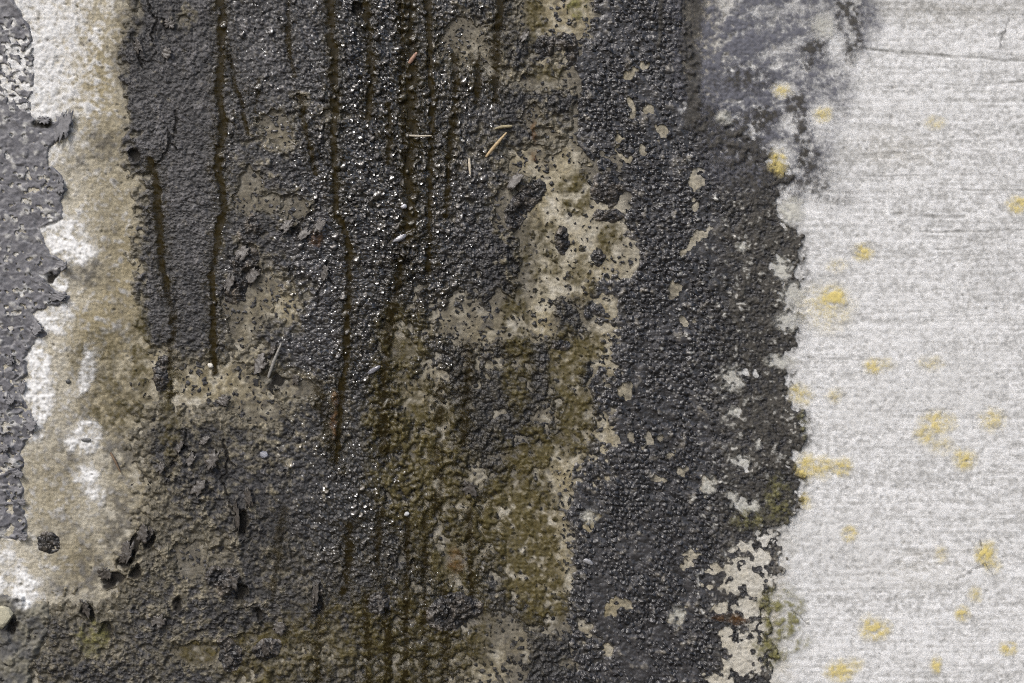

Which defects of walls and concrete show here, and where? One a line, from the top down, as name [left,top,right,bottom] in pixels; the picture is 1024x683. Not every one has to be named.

peeling [0,0,74,541]
water stain [146,157,176,395]
water stain [207,0,260,376]
water stain [297,0,359,473]
water stain [375,257,404,456]
water stain [358,0,505,274]
peeling [506,169,524,192]
water stain [675,0,881,535]
peeling [97,523,155,589]
water stain [340,523,353,596]
water stain [362,492,442,683]
water stain [465,510,474,595]